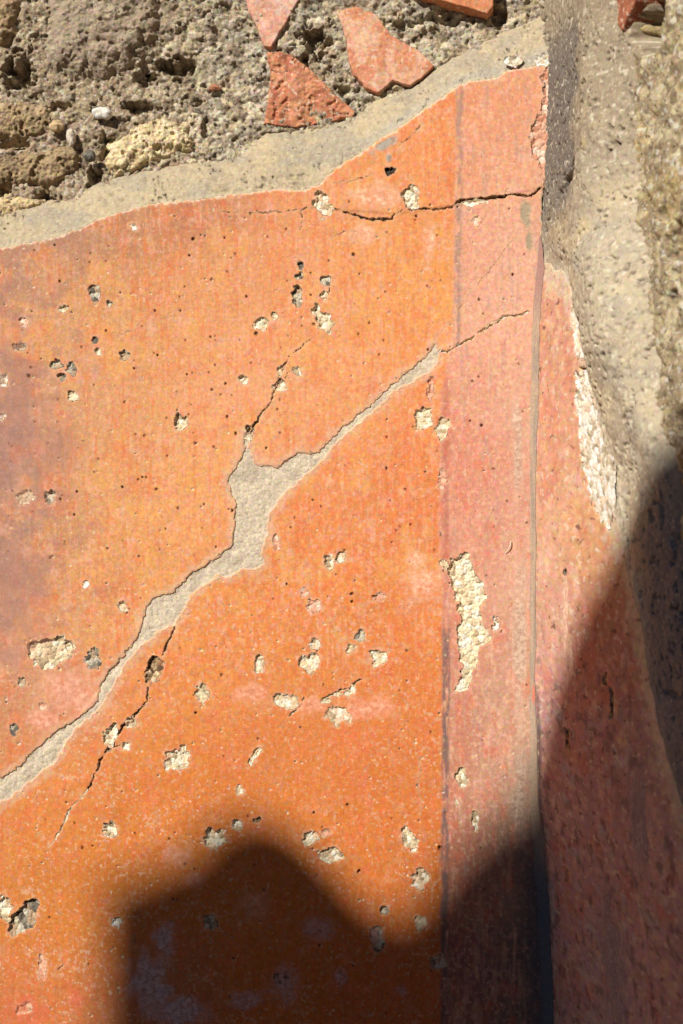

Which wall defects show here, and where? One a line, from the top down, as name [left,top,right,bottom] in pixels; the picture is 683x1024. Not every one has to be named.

flaking render [503,53,549,187]
crack [220,173,542,241]
flaking render [291,261,335,335]
crack [246,337,313,433]
flaking render [570,294,617,529]
flaking render [27,635,102,670]
crack [161,627,175,658]
flaking render [440,552,500,692]
crack [289,679,363,716]
crack [48,686,149,847]
crack [248,748,263,766]
flaking render [0,895,40,937]